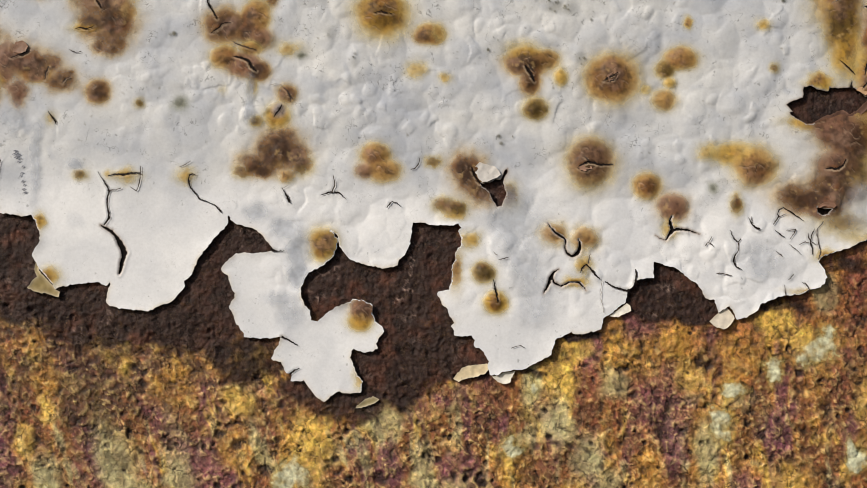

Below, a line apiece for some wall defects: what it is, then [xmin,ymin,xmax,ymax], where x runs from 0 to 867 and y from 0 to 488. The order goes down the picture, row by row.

corrosion [233,84,313,182]
corrosion [503,43,567,120]
corrosion [584,46,697,110]
corrosion [700,109,867,232]
peeling [787,86,867,124]
corrosion [807,0,867,96]
crack [98,166,141,274]
peeling [0,213,275,384]
peeling [280,223,543,424]
crack [544,224,637,312]
peeling [610,262,735,329]
crack [659,207,824,295]